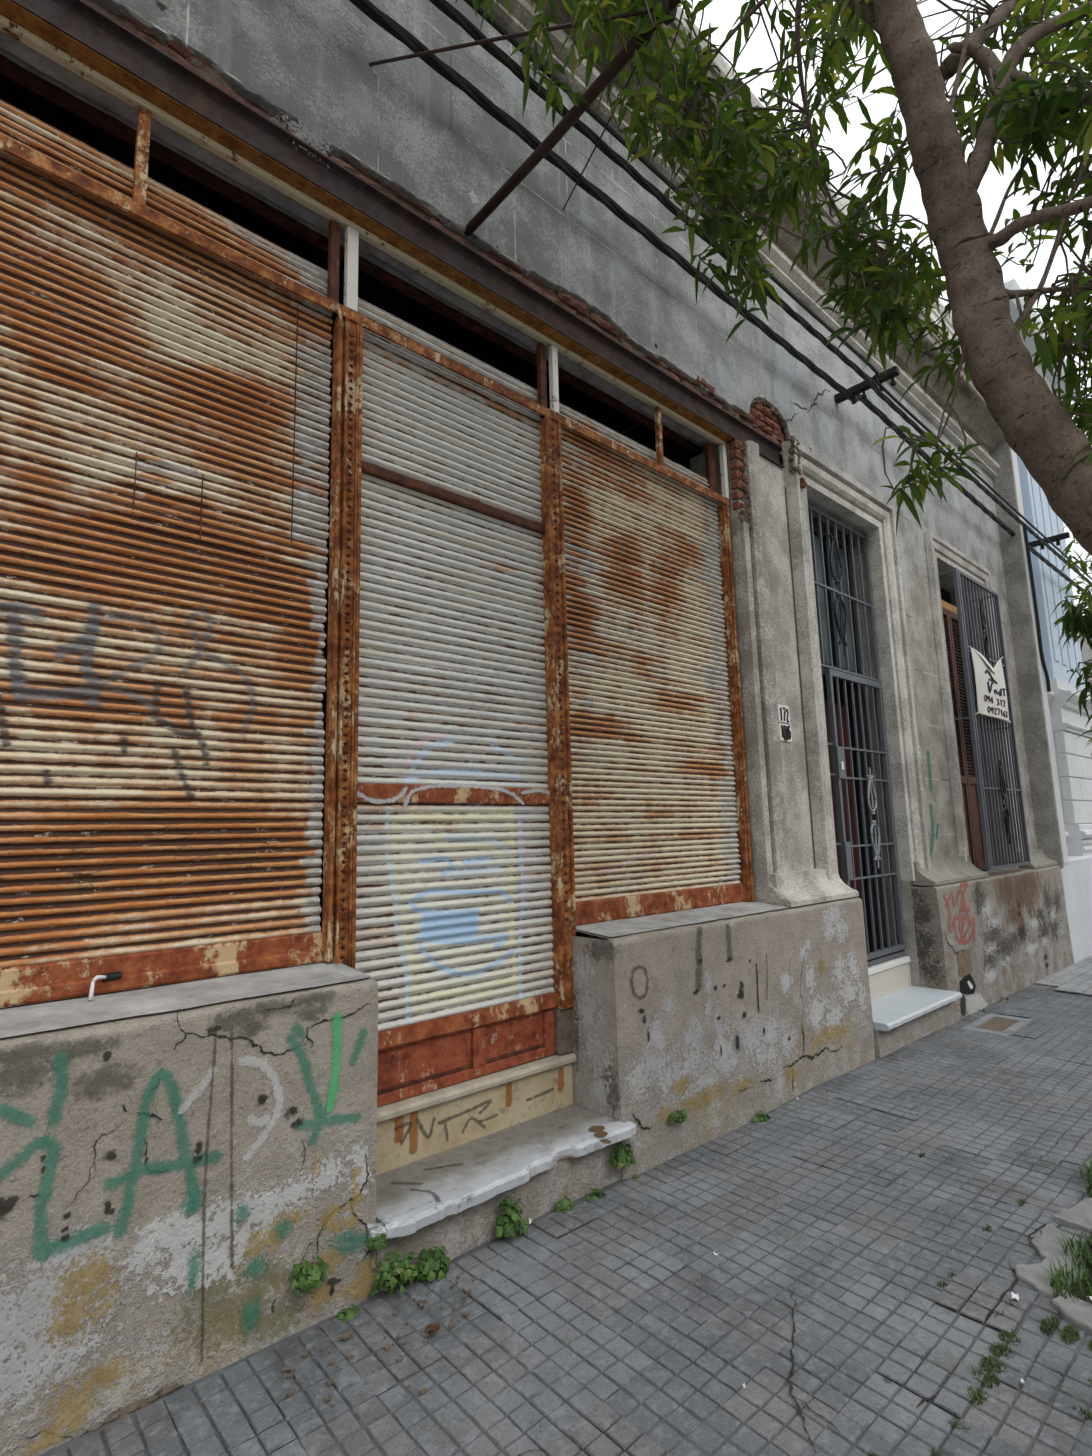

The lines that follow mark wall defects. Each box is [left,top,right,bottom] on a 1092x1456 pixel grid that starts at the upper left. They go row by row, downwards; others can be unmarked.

crack [738,951,842,1091]
crack [28,997,369,1205]
corrosion [395,1111,418,1154]